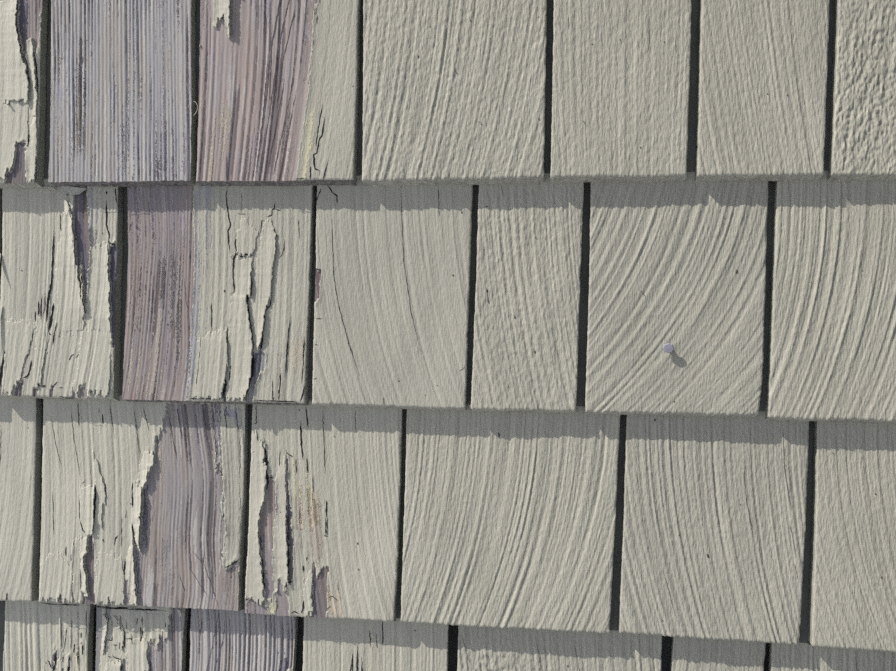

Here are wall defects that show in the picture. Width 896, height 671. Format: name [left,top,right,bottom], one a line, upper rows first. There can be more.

peeling [0,0,329,671]